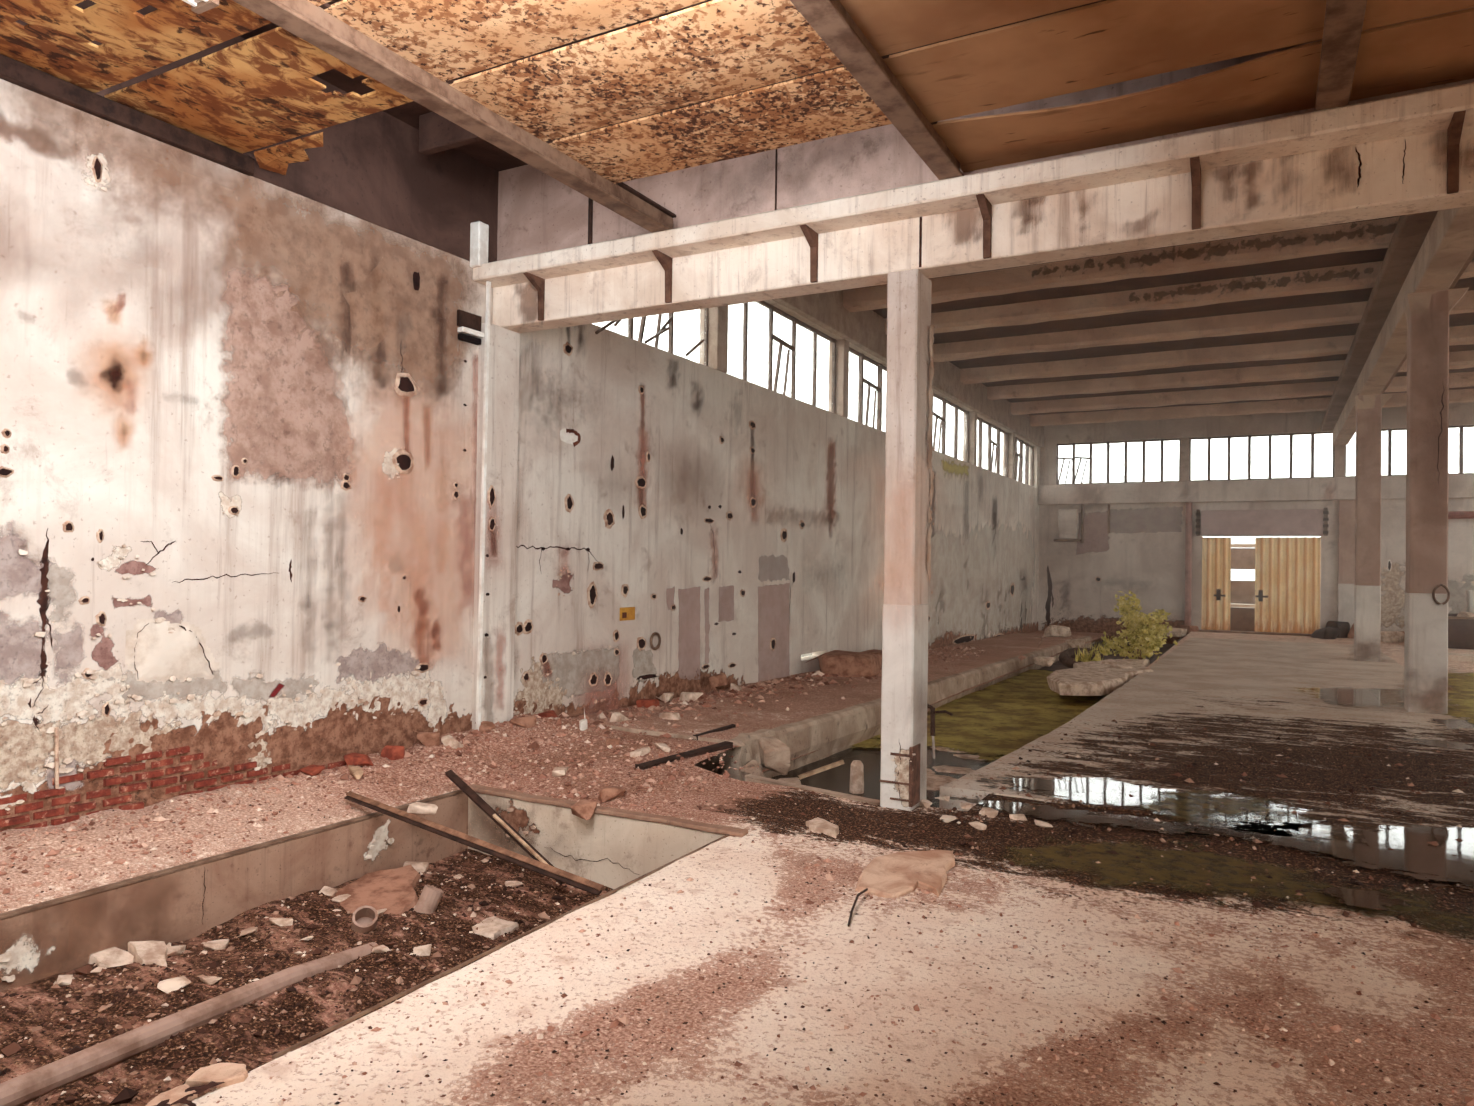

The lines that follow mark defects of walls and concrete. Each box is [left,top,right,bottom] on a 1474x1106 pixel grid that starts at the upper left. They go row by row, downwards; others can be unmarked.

water stain [0,118,67,156]
peeling [26,91,473,518]
spalling [1032,224,1397,277]
spalling [1129,268,1373,301]
corrosion [102,350,149,393]
crack [28,528,53,730]
corrosion [416,591,440,663]
spalling [0,523,472,832]